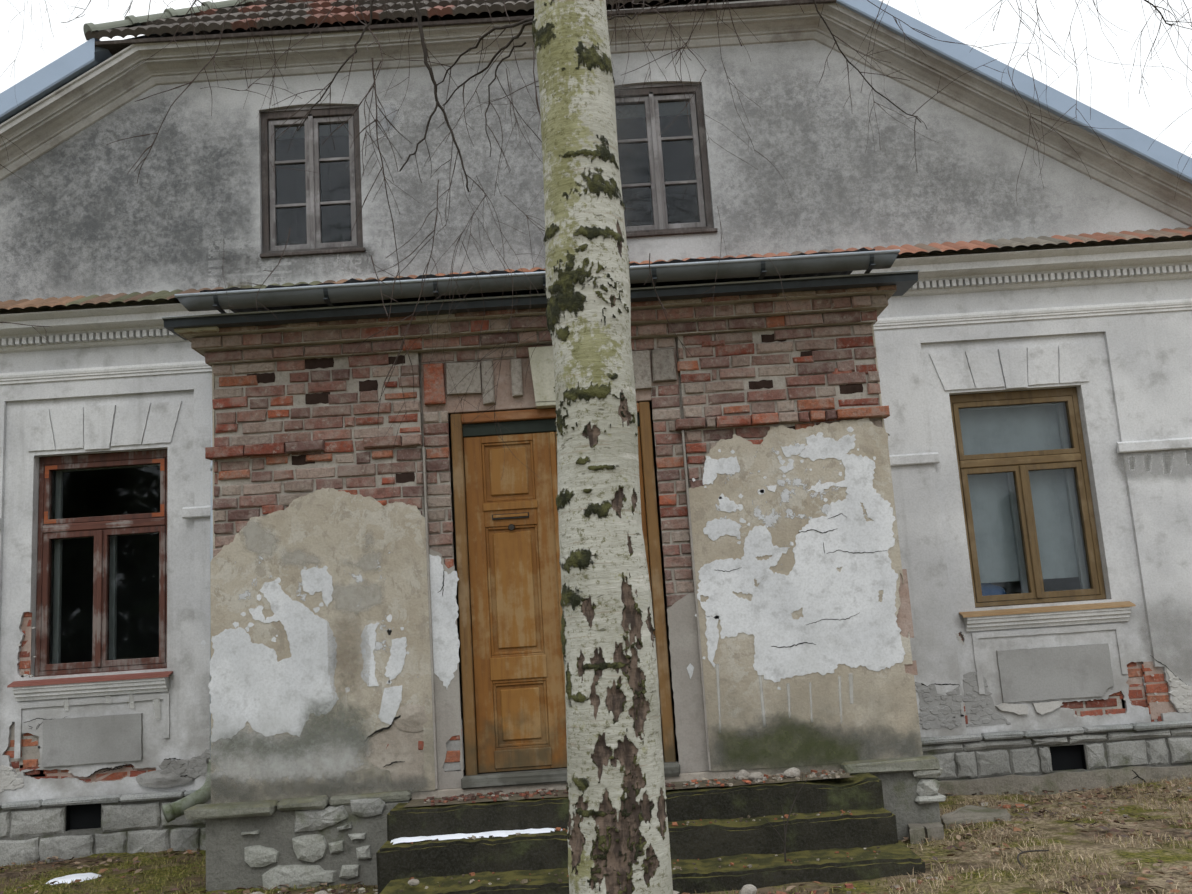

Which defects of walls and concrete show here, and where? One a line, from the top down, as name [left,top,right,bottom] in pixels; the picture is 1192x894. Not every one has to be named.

flaking render [212,345,553,688]
crack [798,513,888,554]
peeling [631,324,1192,730]
crack [771,613,859,648]
peeling [0,565,363,793]
flaking render [360,614,425,790]
damp [220,706,364,755]
flaking render [443,718,464,771]
damp [713,724,919,767]
damp [212,778,425,801]